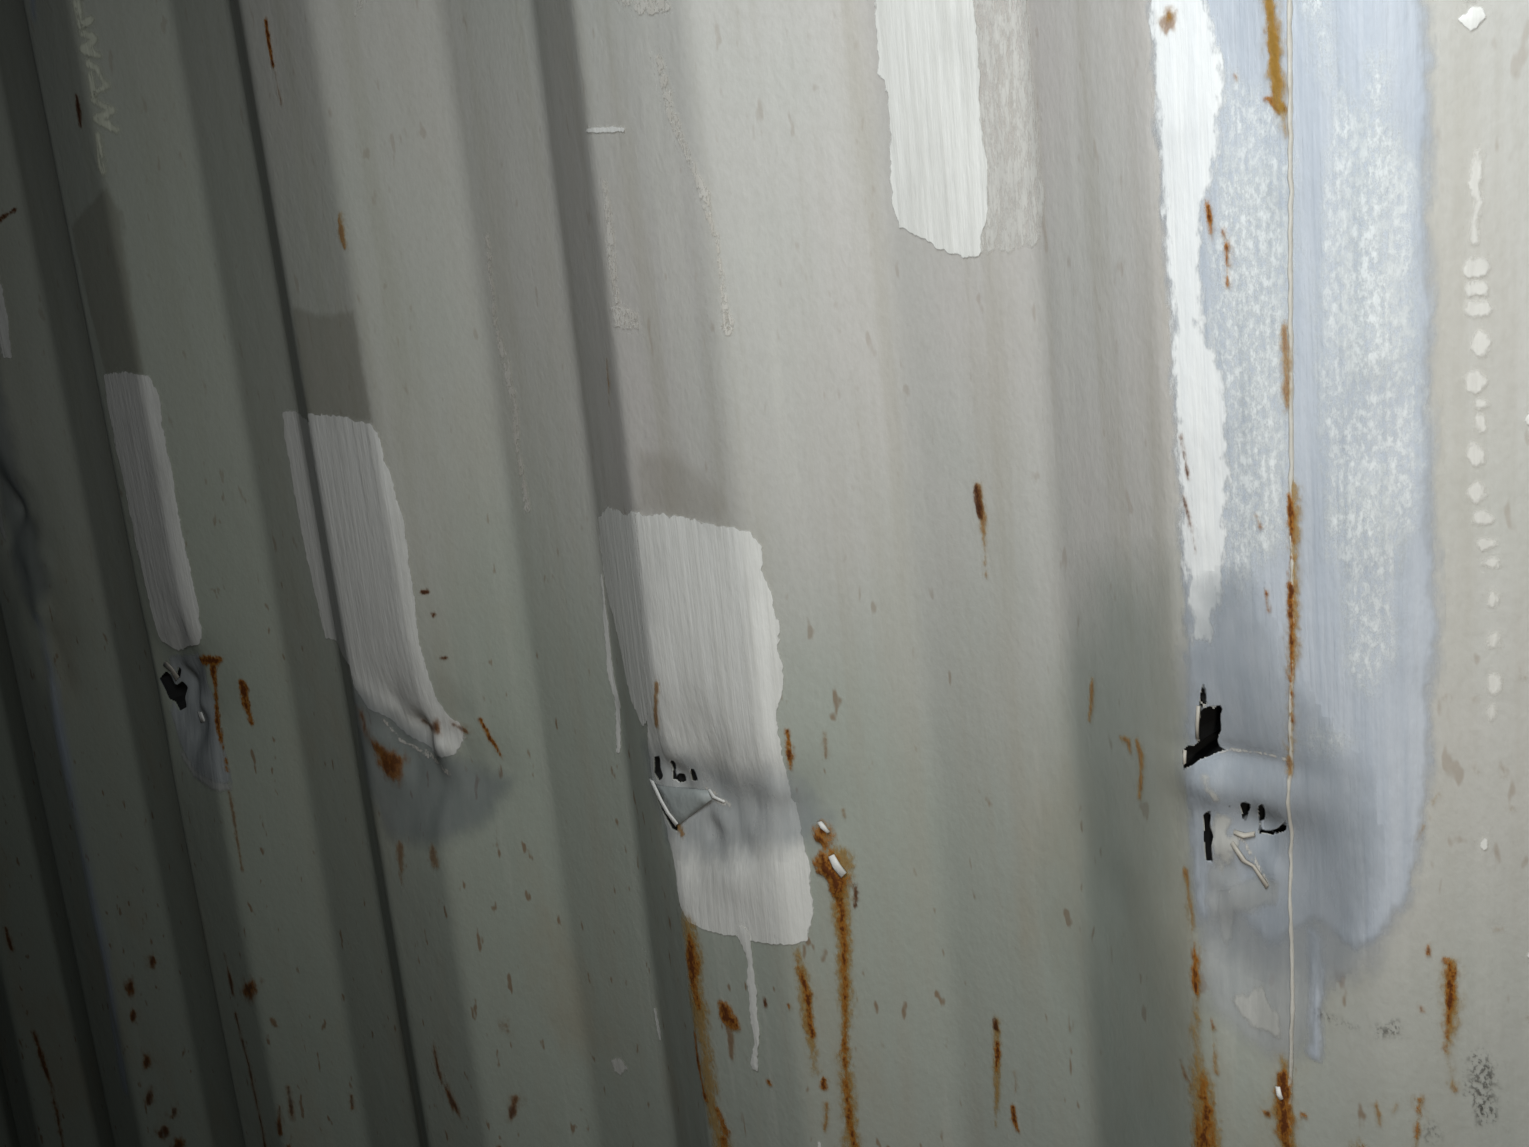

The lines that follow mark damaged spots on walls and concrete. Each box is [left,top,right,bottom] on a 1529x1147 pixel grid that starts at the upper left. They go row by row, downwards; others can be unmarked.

rust [1264,0,1287,129]
rust [973,484,986,543]
rust [199,655,228,772]
rust [361,714,403,780]
peeling [1203,775,1238,868]
rust [683,919,741,1147]
rust [787,950,816,1054]
rust [812,821,860,1147]
rust [1191,948,1199,995]
rust [1190,1013,1221,1147]
rust [1263,1058,1307,1147]
rust [1426,945,1458,1047]